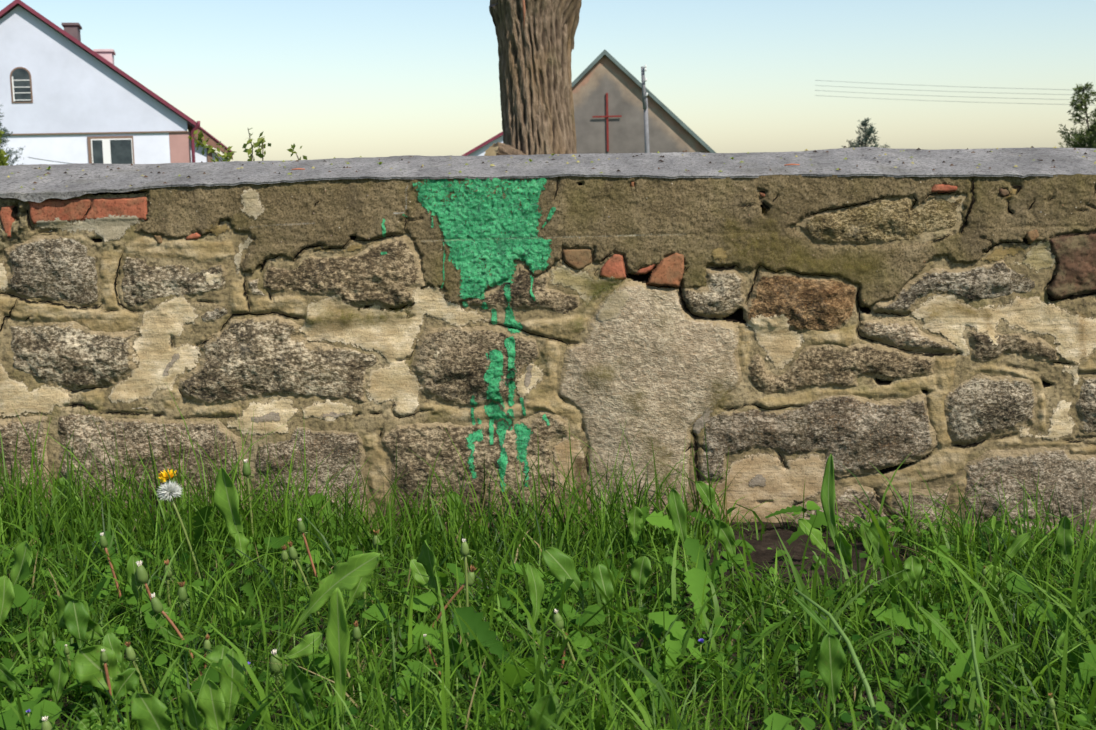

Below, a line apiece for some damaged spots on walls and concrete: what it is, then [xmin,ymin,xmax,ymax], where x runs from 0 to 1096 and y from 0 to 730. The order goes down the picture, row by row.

peeling [36,214,140,242]
crack [805,196,887,217]
crack [911,179,1024,253]
crack [1008,185,1053,214]
crack [1052,188,1096,238]
crack [170,214,420,348]